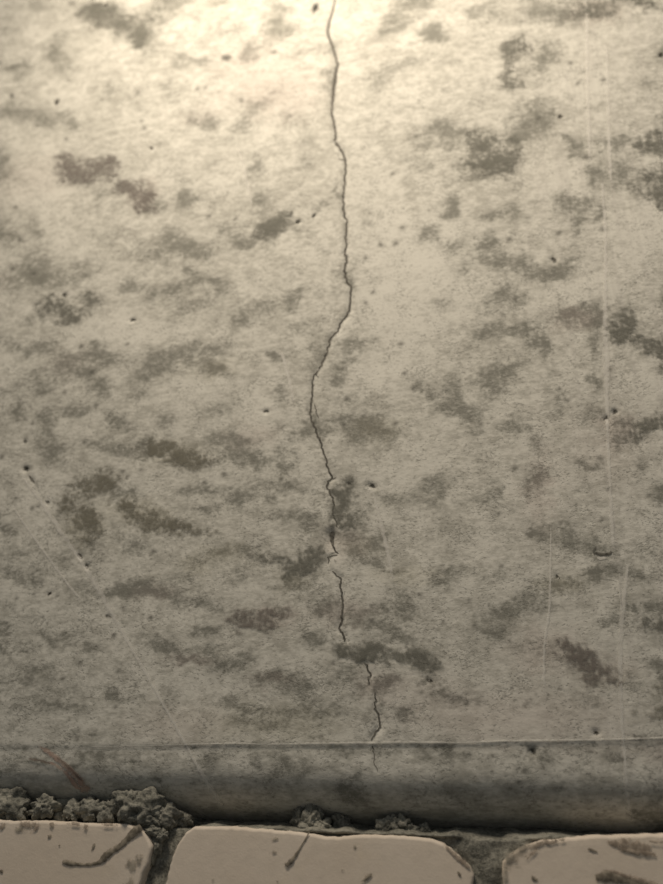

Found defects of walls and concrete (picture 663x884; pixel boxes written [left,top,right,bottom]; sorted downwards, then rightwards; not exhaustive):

crack [309,0,352,641]
crack [364,663,381,771]